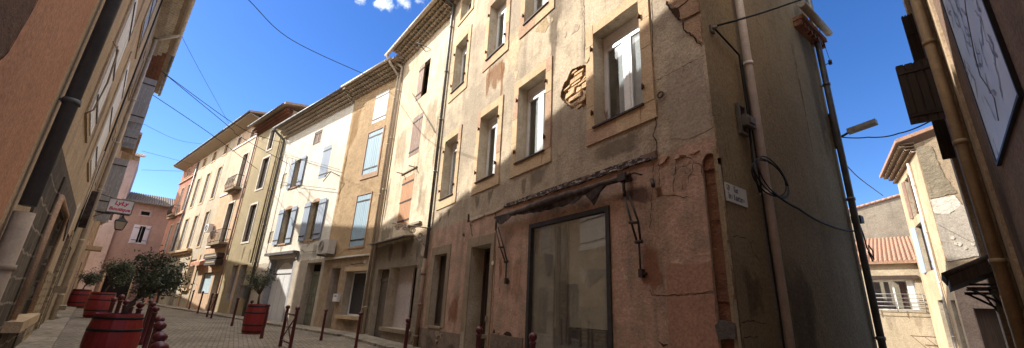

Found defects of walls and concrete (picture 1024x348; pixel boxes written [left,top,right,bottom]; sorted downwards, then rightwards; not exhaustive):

spalling [560,57,590,109]
flaking render [665,0,712,139]
crack [649,118,702,228]
flaking render [665,154,737,348]
flaking render [916,146,979,261]